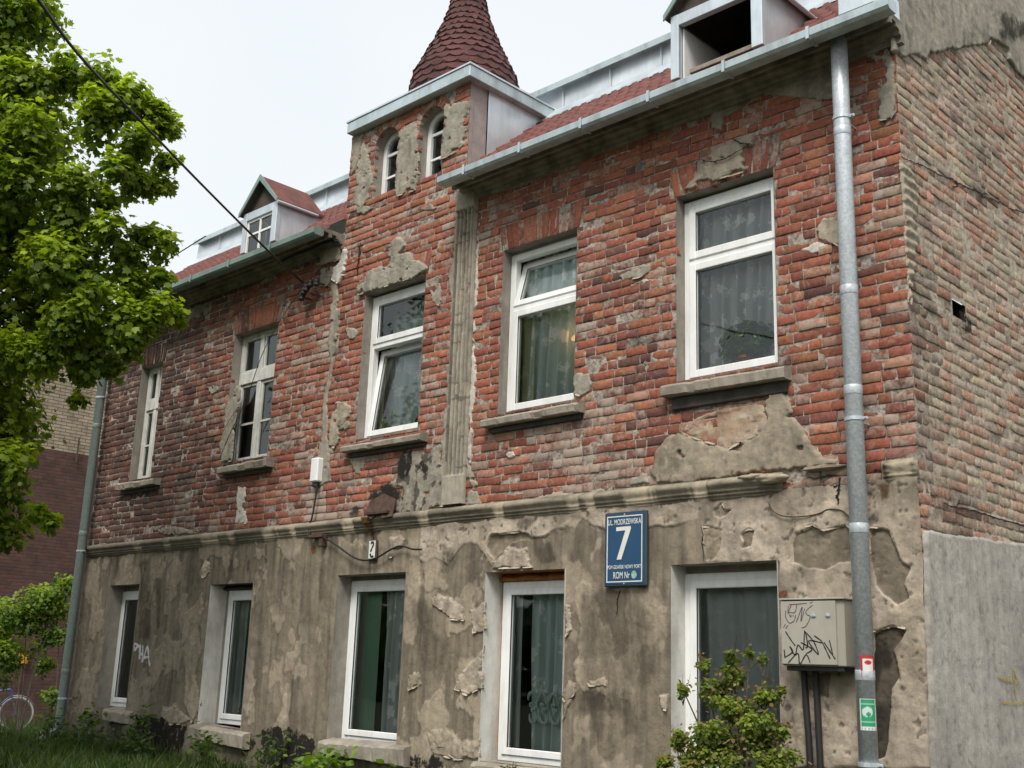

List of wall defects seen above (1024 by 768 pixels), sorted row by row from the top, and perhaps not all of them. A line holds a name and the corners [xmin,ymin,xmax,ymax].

flaking render [868,0,1024,122]
flaking render [395,121,421,197]
flaking render [439,101,471,160]
flaking render [685,69,832,191]
crack [901,156,1024,219]
flaking render [356,205,457,351]
flaking render [317,247,359,486]
leakage [348,449,428,515]
flaking render [629,393,848,489]
flaking render [487,531,534,569]
flaking render [869,526,911,605]
flaking render [873,624,906,759]